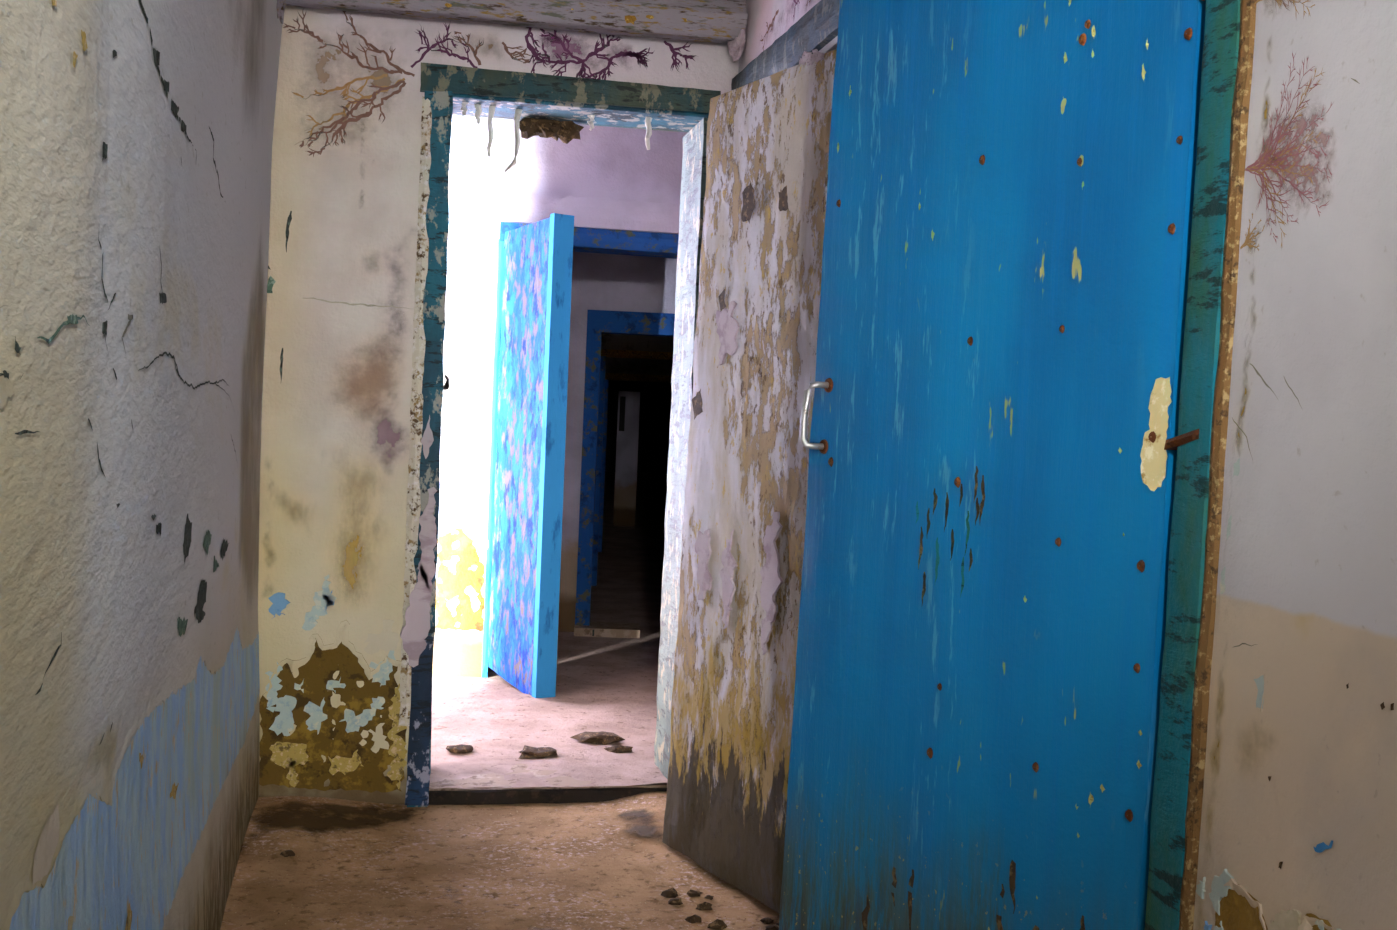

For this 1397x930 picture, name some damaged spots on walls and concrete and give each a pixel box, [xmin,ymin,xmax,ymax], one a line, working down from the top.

damp [1255,0,1315,19]
damp [283,9,483,157]
damp [502,27,695,80]
damp [1240,52,1334,251]
damp [350,352,390,407]
damp [376,418,401,463]
peeling [760,512,783,655]
peeling [4,487,488,930]
spalling [1196,869,1341,930]